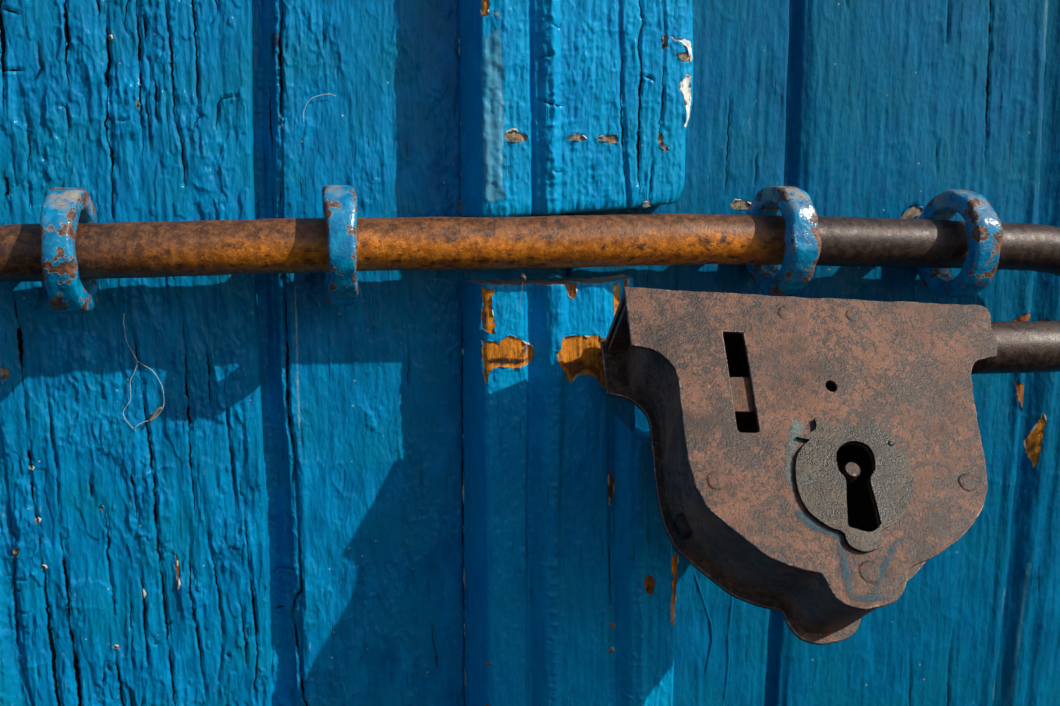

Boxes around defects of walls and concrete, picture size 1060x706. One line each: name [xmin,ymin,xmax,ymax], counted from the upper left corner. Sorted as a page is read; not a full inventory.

crack [0,0,22,115]
crack [56,0,70,134]
crack [96,0,218,216]
peeling [504,128,530,143]
peeling [568,133,618,144]
crack [620,0,665,203]
peeling [661,32,693,127]
crack [284,282,296,482]
peeling [480,286,534,385]
peeling [566,281,578,299]
peeling [557,334,605,388]
crack [13,287,259,706]